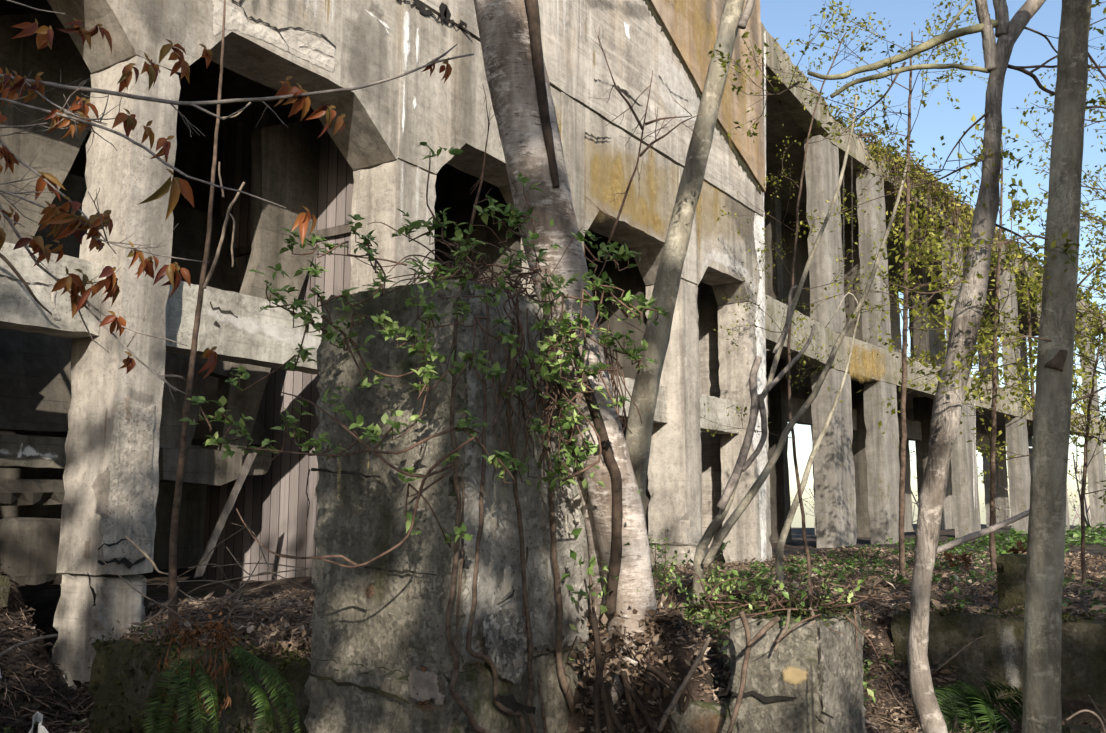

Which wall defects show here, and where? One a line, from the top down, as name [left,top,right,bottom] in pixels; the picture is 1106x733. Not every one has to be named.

spalling [211,0,335,72]
crack [232,0,336,57]
leakage [592,157,625,209]
spalling [91,400,155,560]
spalling [482,566,528,684]
crack [295,669,409,704]
crack [728,691,796,703]